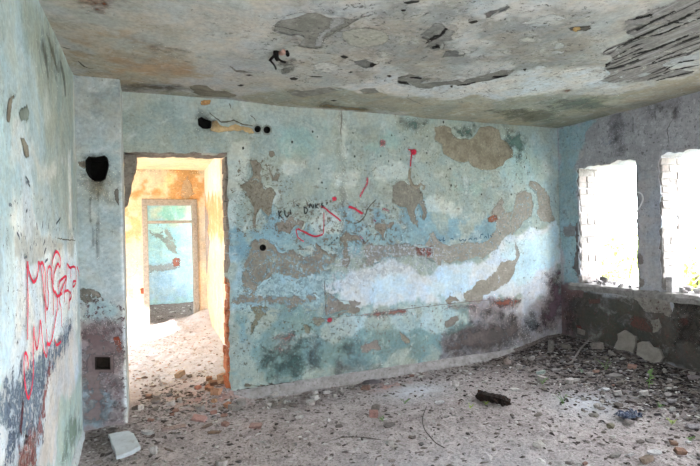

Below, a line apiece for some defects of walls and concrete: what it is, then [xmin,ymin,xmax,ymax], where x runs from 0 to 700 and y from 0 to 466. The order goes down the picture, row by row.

peeling [7,92,29,123]
spalling [262,0,700,111]
peeling [230,121,556,388]
water stain [444,270,577,358]
water stain [65,322,126,457]